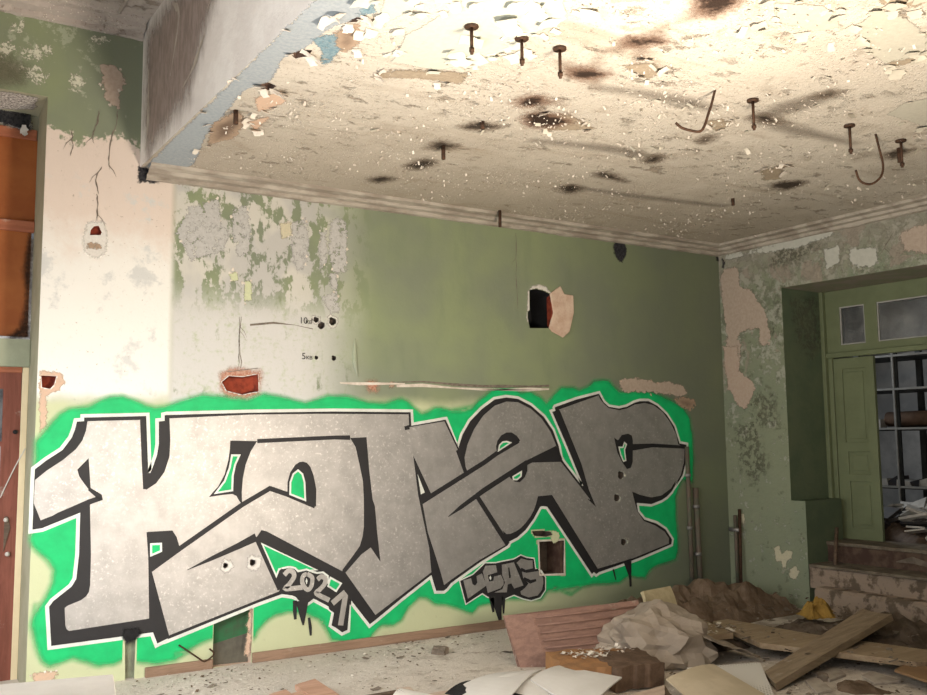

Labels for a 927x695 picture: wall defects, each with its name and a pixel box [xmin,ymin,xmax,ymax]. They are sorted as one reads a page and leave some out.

peeling [67,68,85,92]
peeling [98,64,127,110]
crack [64,111,118,223]
flaking render [82,221,107,258]
peeling [176,197,252,262]
peeling [899,223,927,255]
peeling [279,216,348,328]
spalling [526,284,574,337]
peeling [719,227,879,409]
flaking render [220,368,262,399]
flaking render [619,377,696,411]